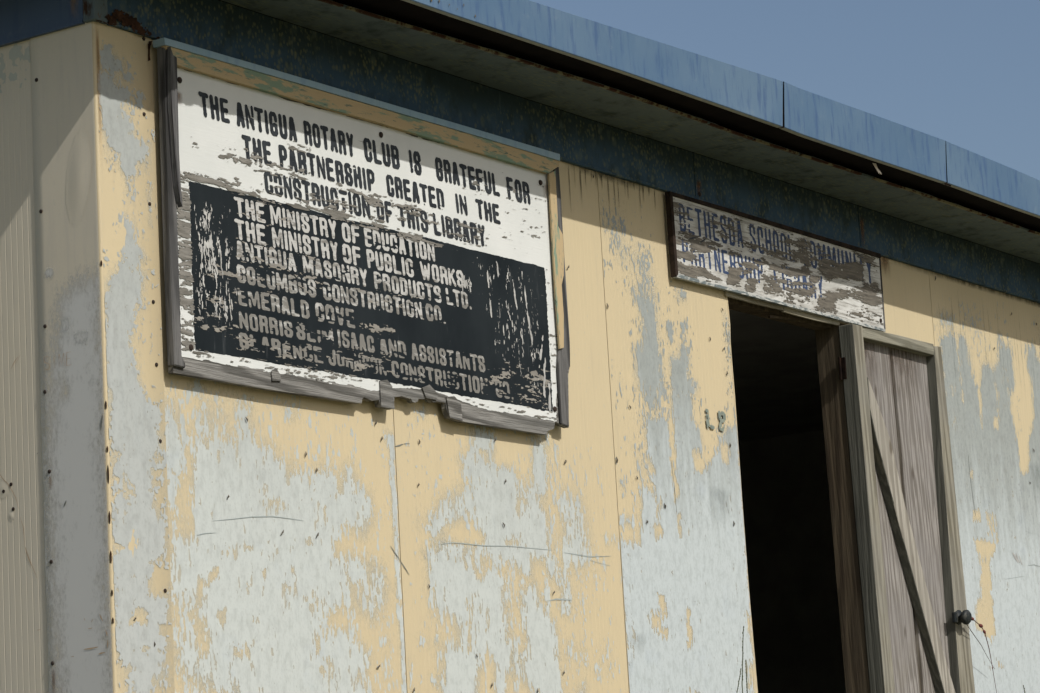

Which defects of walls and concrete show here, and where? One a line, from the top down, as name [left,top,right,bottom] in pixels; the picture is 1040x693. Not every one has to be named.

rust [96,9,160,61]
peeling [44,40,755,693]
peeling [934,296,1040,693]